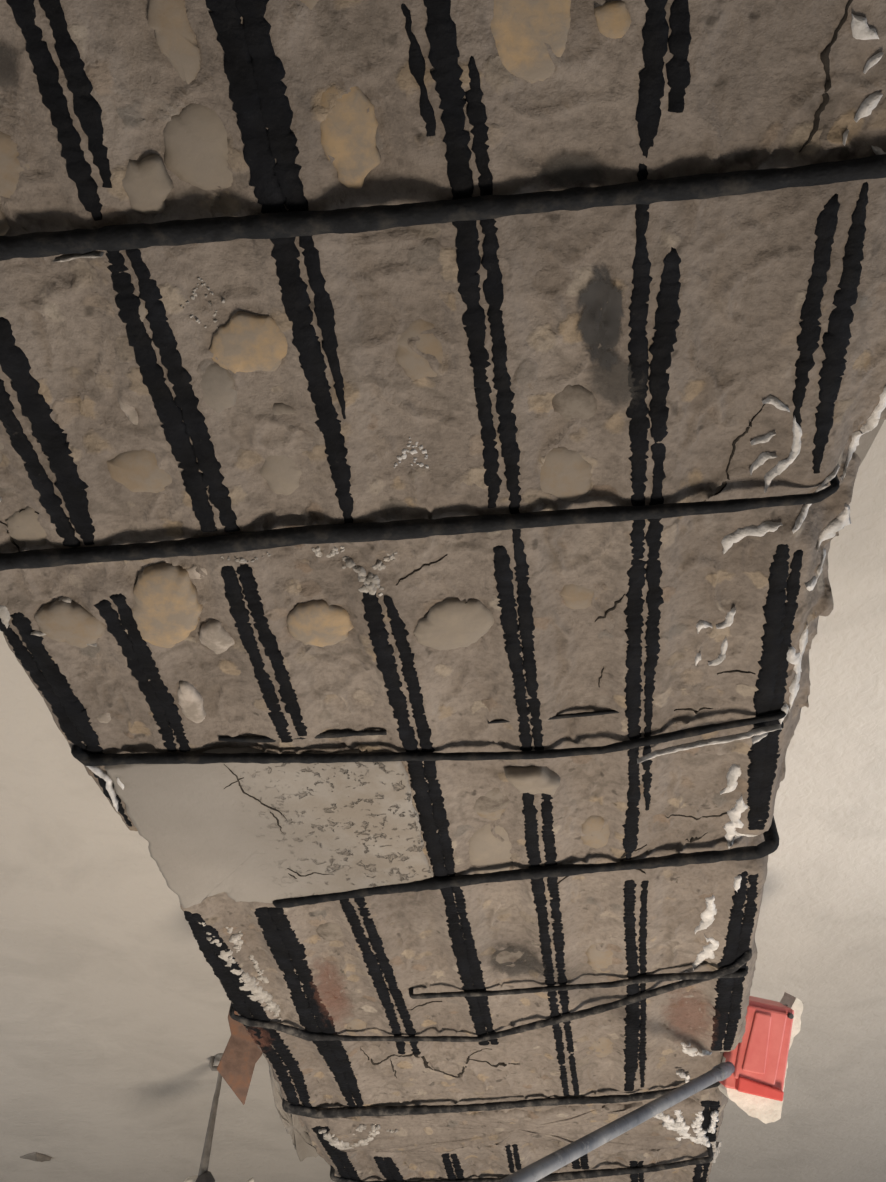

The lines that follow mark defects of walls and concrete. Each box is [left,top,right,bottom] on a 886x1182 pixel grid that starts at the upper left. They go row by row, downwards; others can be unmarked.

spalling [0,0,886,236]
crack [799,0,853,153]
crack [705,404,765,501]
spalling [0,178,886,1115]
crack [224,764,287,834]
crack [361,1048,519,1078]
peeling [20,1152,52,1162]
spalling [298,1115,568,1181]
spalling [553,1087,728,1182]